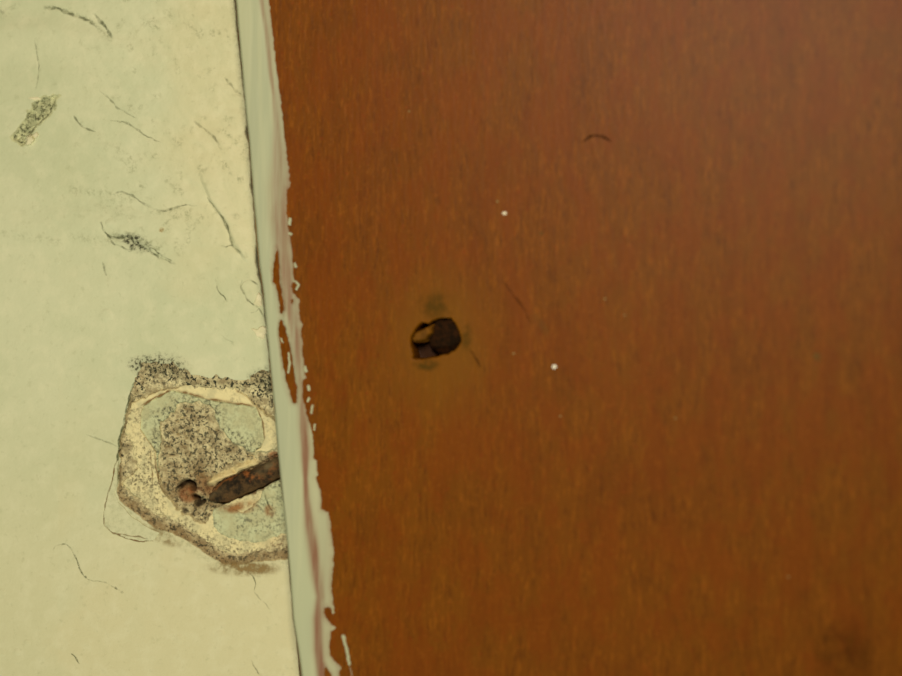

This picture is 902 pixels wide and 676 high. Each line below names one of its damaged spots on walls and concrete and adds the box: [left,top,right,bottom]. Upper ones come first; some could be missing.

spalling [10,93,61,147]
spalling [103,361,288,565]
rust [209,457,280,511]